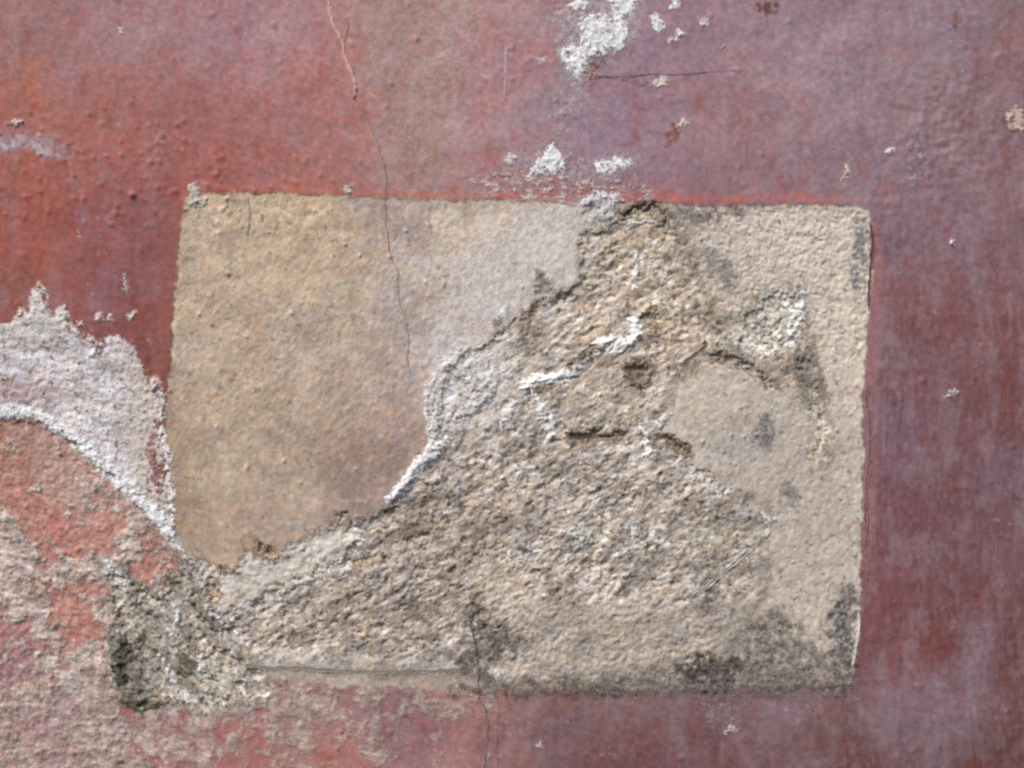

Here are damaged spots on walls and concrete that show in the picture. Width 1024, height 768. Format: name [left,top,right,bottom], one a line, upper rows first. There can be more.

peeling [561,0,638,80]
peeling [650,0,685,44]
peeling [650,75,668,87]
crack [326,0,411,376]
spalling [0,142,835,768]